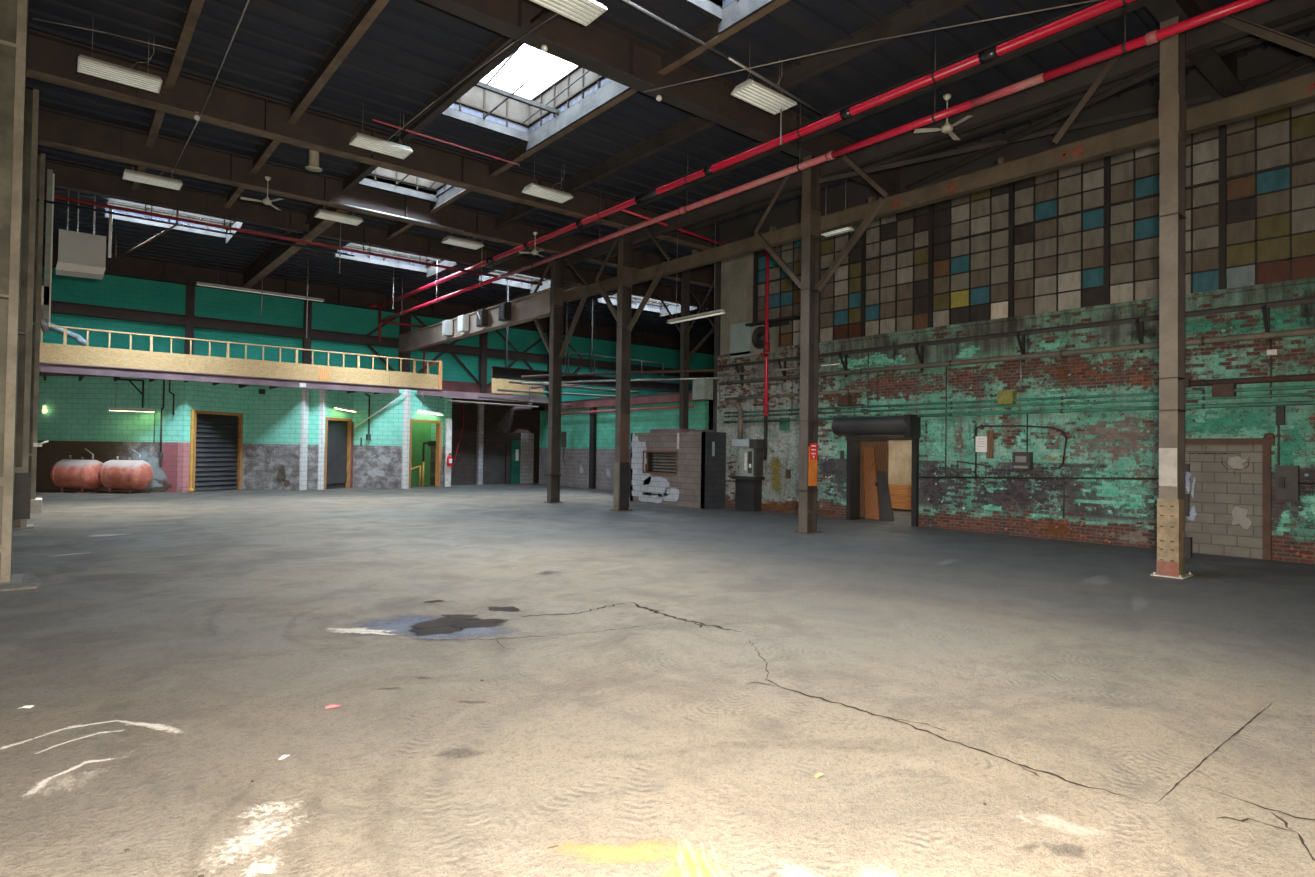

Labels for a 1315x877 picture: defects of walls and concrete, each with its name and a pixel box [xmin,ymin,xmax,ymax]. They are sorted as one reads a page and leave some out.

peeling [818,335,1159,545]
leakage [328,614,504,636]
crack [398,602,1315,860]